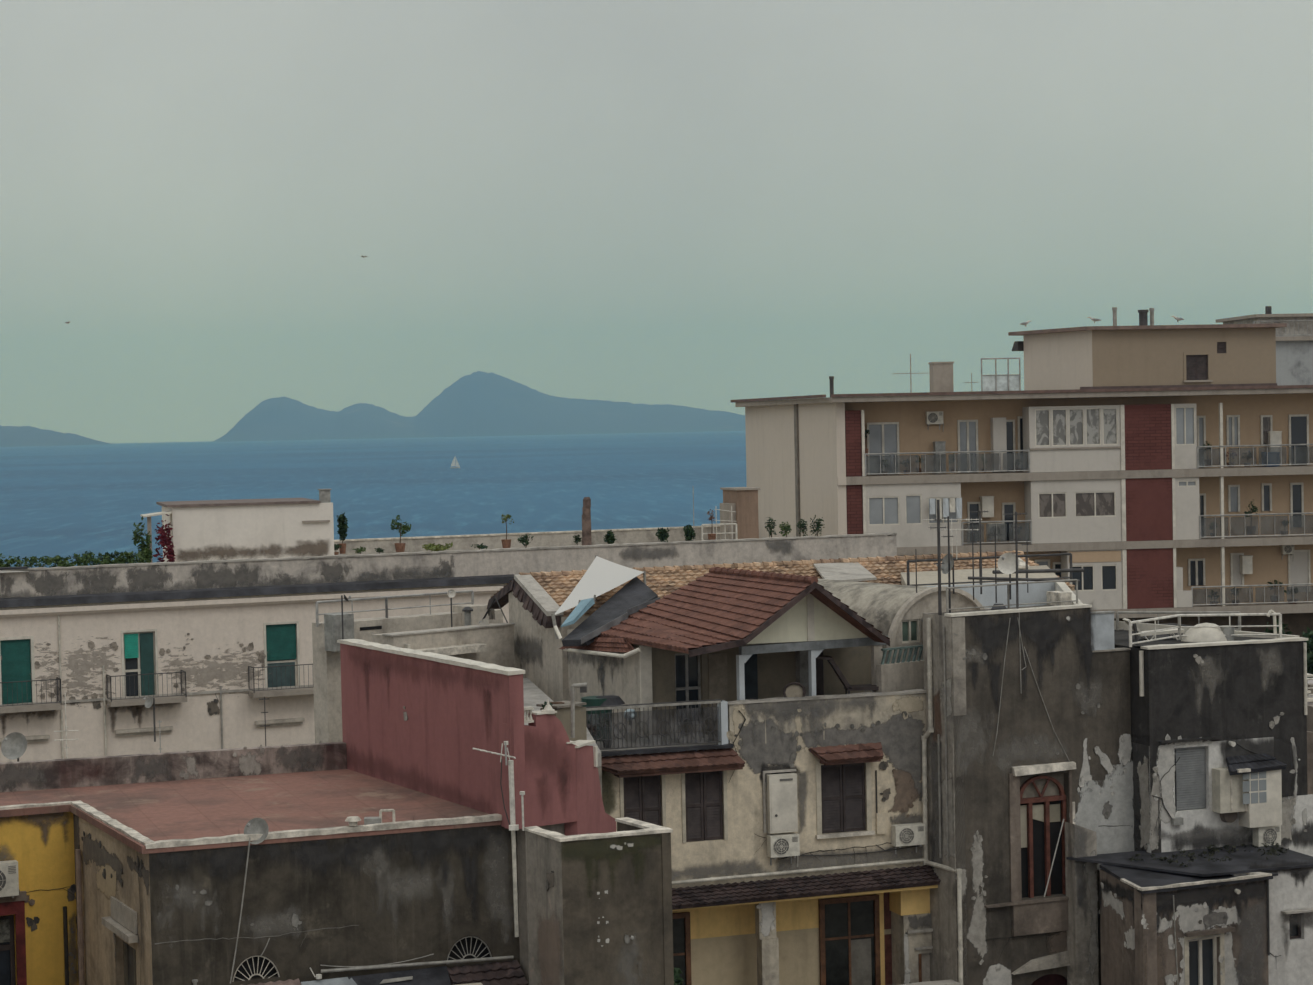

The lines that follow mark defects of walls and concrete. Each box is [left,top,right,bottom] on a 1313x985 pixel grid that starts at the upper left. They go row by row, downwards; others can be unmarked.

damp [0,540,454,598]
peeling [34,636,120,709]
damp [1197,658,1220,710]
damp [1261,651,1281,689]
spalling [727,695,927,817]
peeling [1069,734,1241,985]
peeling [756,902,775,937]
peeling [955,830,1012,985]